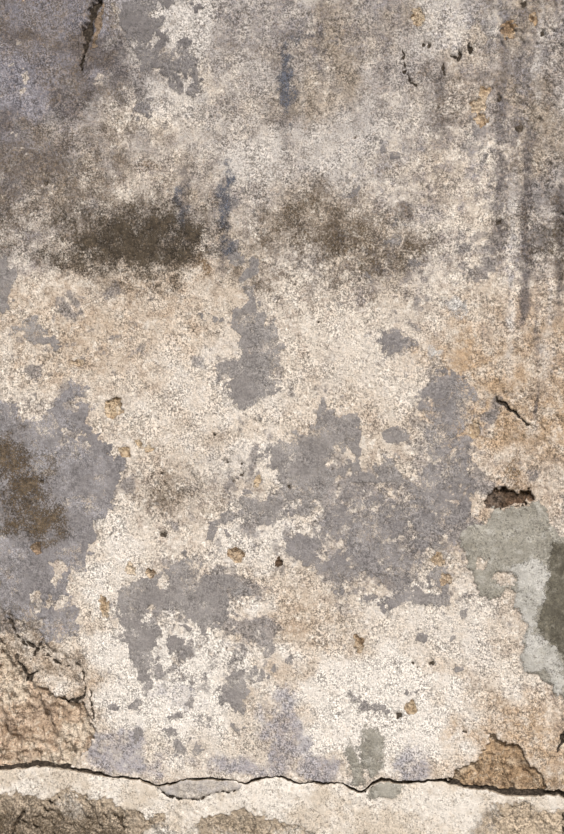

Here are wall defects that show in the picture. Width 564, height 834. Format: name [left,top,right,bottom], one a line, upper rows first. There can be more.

crack [80,0,103,71]
leakage [36,159,235,295]
leakage [273,190,436,286]
crack [495,396,530,426]
leakage [0,424,71,548]
peeling [206,367,480,615]
flaking render [484,486,535,509]
crack [7,617,95,719]
peeling [0,633,564,834]
crack [0,760,564,834]